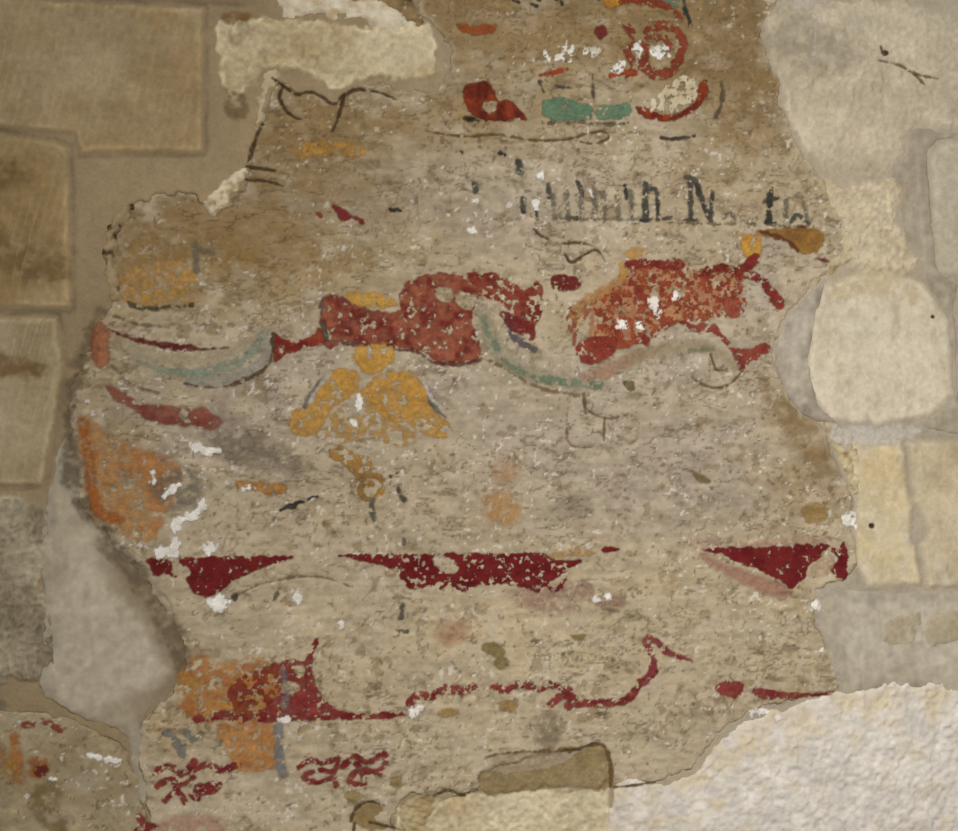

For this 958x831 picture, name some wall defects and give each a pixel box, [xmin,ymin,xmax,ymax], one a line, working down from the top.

crack [272,77,395,131]
crack [245,123,280,185]
spalling [823,421,860,495]
flaking render [841,511,857,529]
flaking render [478,742,613,795]
flaking render [344,791,387,829]
flaking render [400,794,434,831]